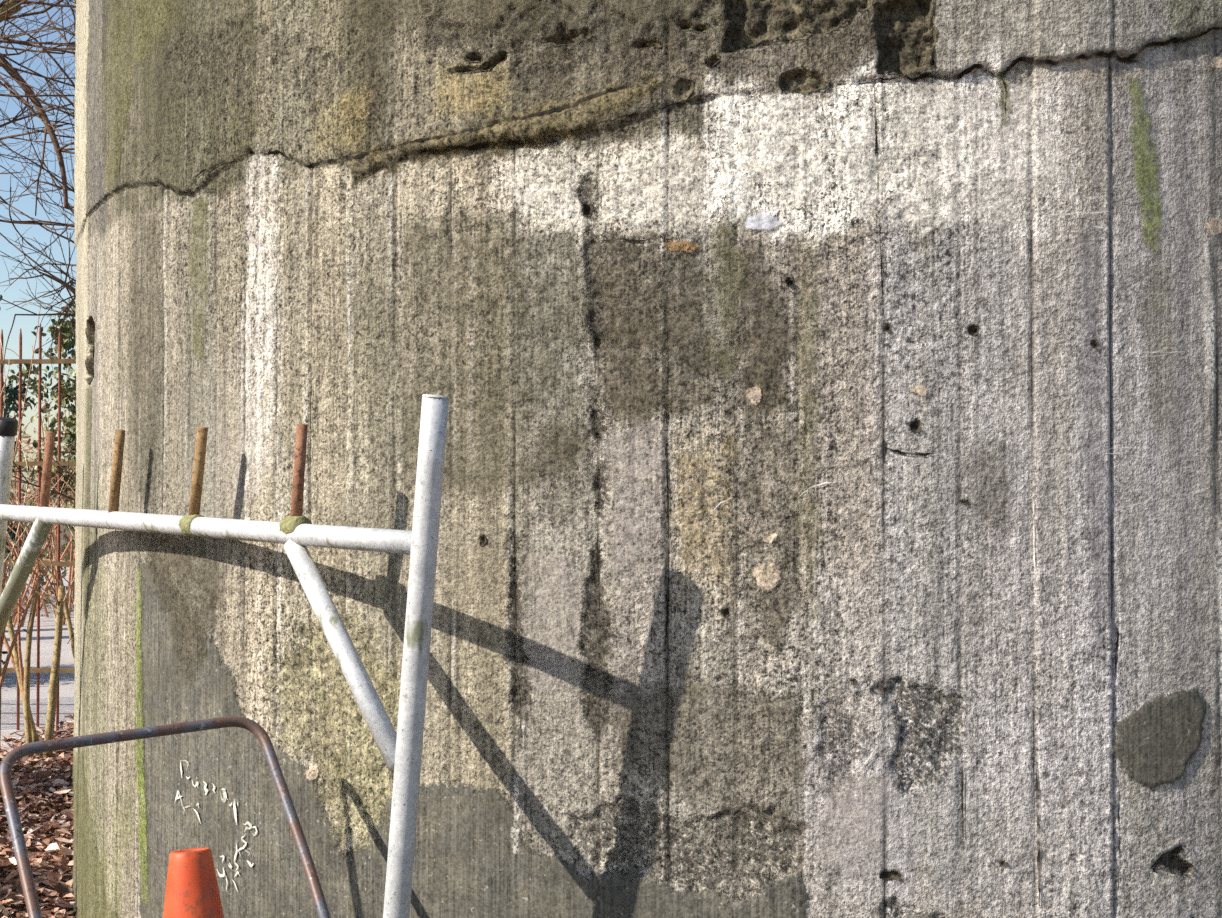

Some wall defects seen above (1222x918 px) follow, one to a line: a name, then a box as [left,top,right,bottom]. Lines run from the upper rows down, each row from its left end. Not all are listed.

crack [742,39,792,49]
crack [82,80,651,231]
crack [859,7,1222,299]
spalling [85,316,95,385]
peeling [136,559,400,918]
water stain [174,760,257,892]
peeling [409,783,811,918]